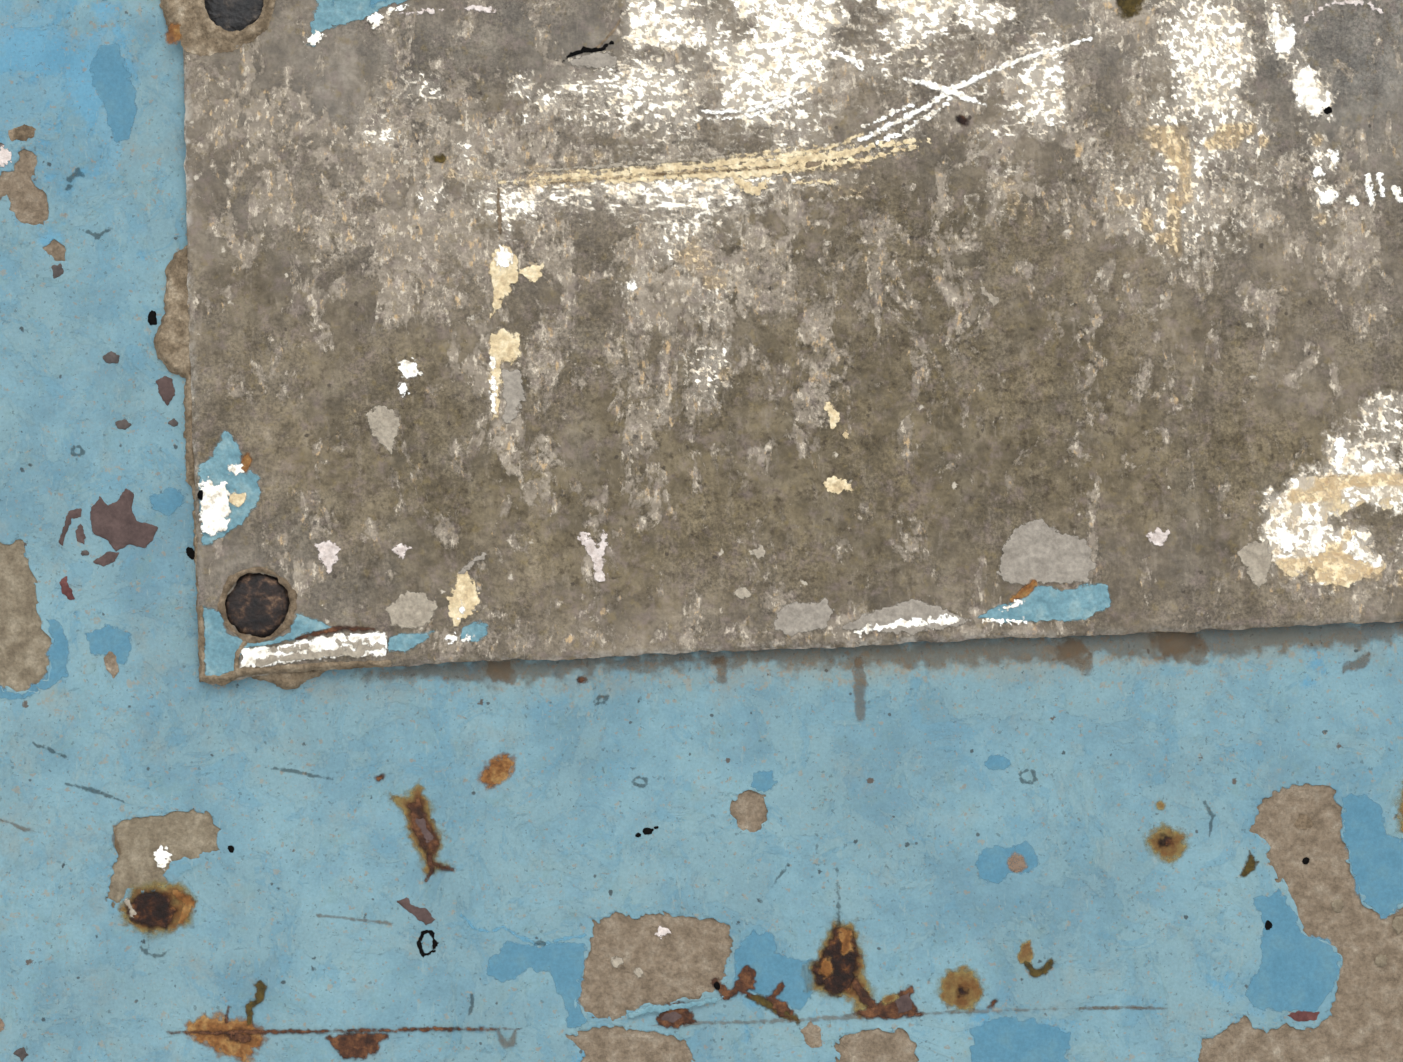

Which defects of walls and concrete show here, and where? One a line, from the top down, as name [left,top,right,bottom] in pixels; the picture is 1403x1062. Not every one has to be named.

peeling [367,4,444,29]
peeling [465,5,496,13]
peeling [0,539,69,700]
peeling [59,576,75,600]
peeling [85,625,131,678]
peeling [106,808,234,908]
corrosion [394,785,454,882]
corrosion [119,883,195,934]
corrosion [186,980,267,1062]
peeling [487,911,919,1062]
corrosion [809,922,923,1020]
peeling [1198,783,1403,1062]